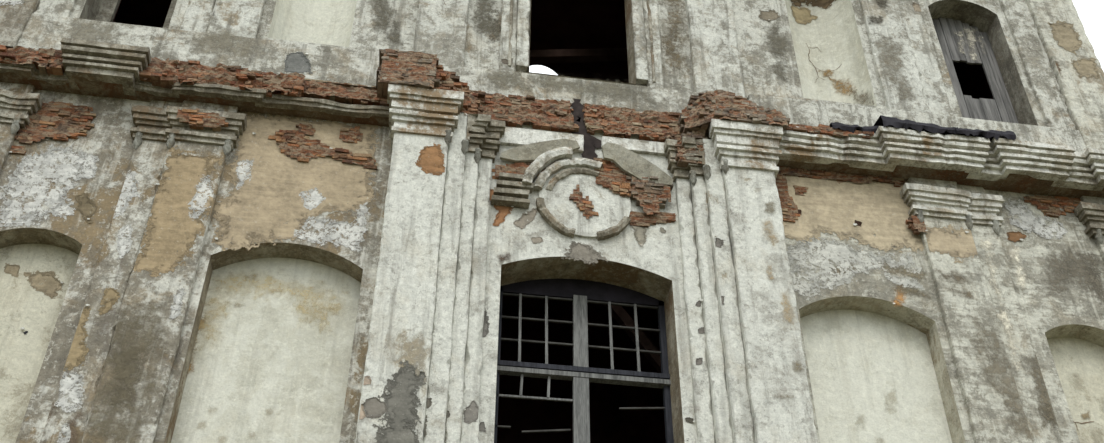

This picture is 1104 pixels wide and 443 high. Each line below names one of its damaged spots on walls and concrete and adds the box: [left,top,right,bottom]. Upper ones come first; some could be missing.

flaking render [758,0,836,25]
spalling [0,45,65,76]
spalling [139,49,874,167]
peeling [0,101,99,229]
flaking render [113,112,383,279]
flaking render [415,143,445,176]
spalling [490,162,553,243]
spalling [569,185,599,219]
spalling [593,158,676,246]
flaking render [775,166,977,300]
flaking render [4,263,64,299]
peeling [169,286,186,319]